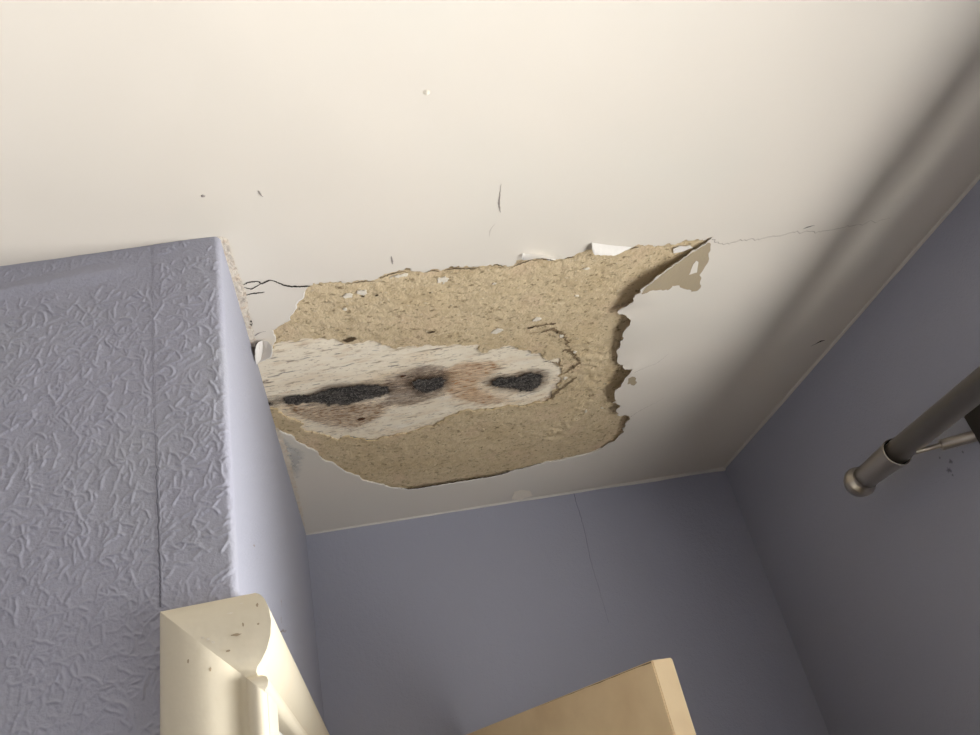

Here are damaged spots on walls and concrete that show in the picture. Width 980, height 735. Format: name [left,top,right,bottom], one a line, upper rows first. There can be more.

crack [244,280,310,295]
water stain [268,366,448,427]
flaking render [218,236,711,490]
water stain [489,372,544,392]